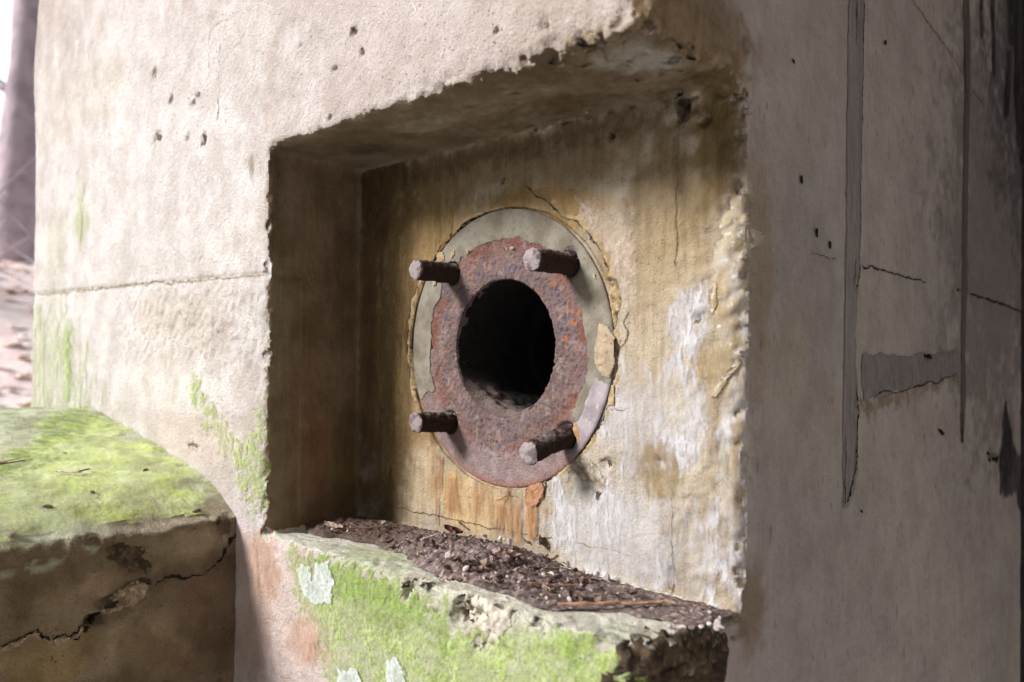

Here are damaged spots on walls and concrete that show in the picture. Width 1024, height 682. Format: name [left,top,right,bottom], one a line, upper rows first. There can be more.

crack [856,1,865,190]
crack [811,223,926,289]
crack [956,287,1022,313]
leakage [621,282,748,609]
spalling [100,542,152,614]
crack [145,534,236,585]
rust [497,481,545,540]
leakage [552,477,624,579]
crack [0,625,85,653]
spalling [601,625,729,682]